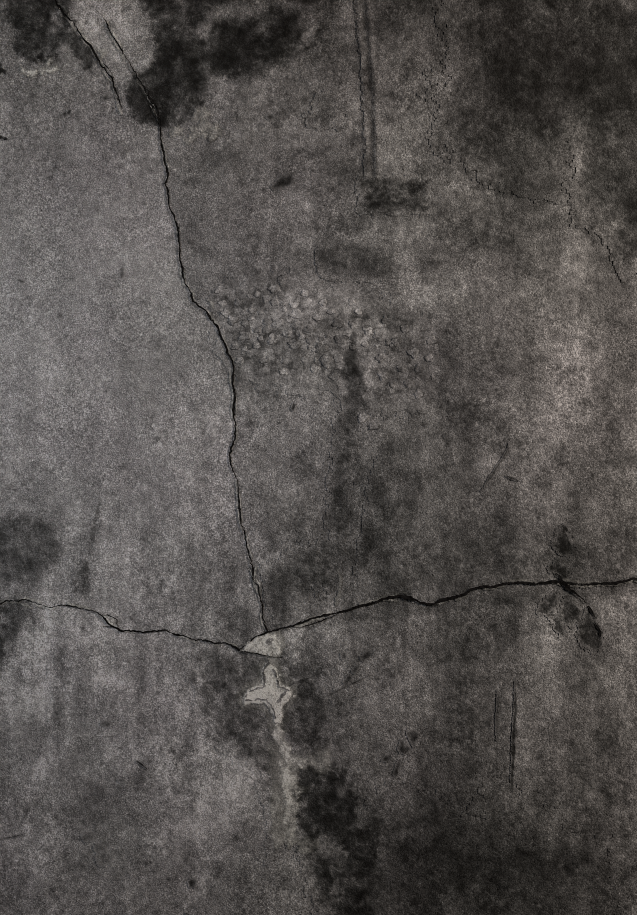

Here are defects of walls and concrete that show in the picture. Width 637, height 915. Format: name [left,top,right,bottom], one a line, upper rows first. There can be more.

damp [119,0,434,217]
crack [0,0,637,658]
damp [183,536,628,915]